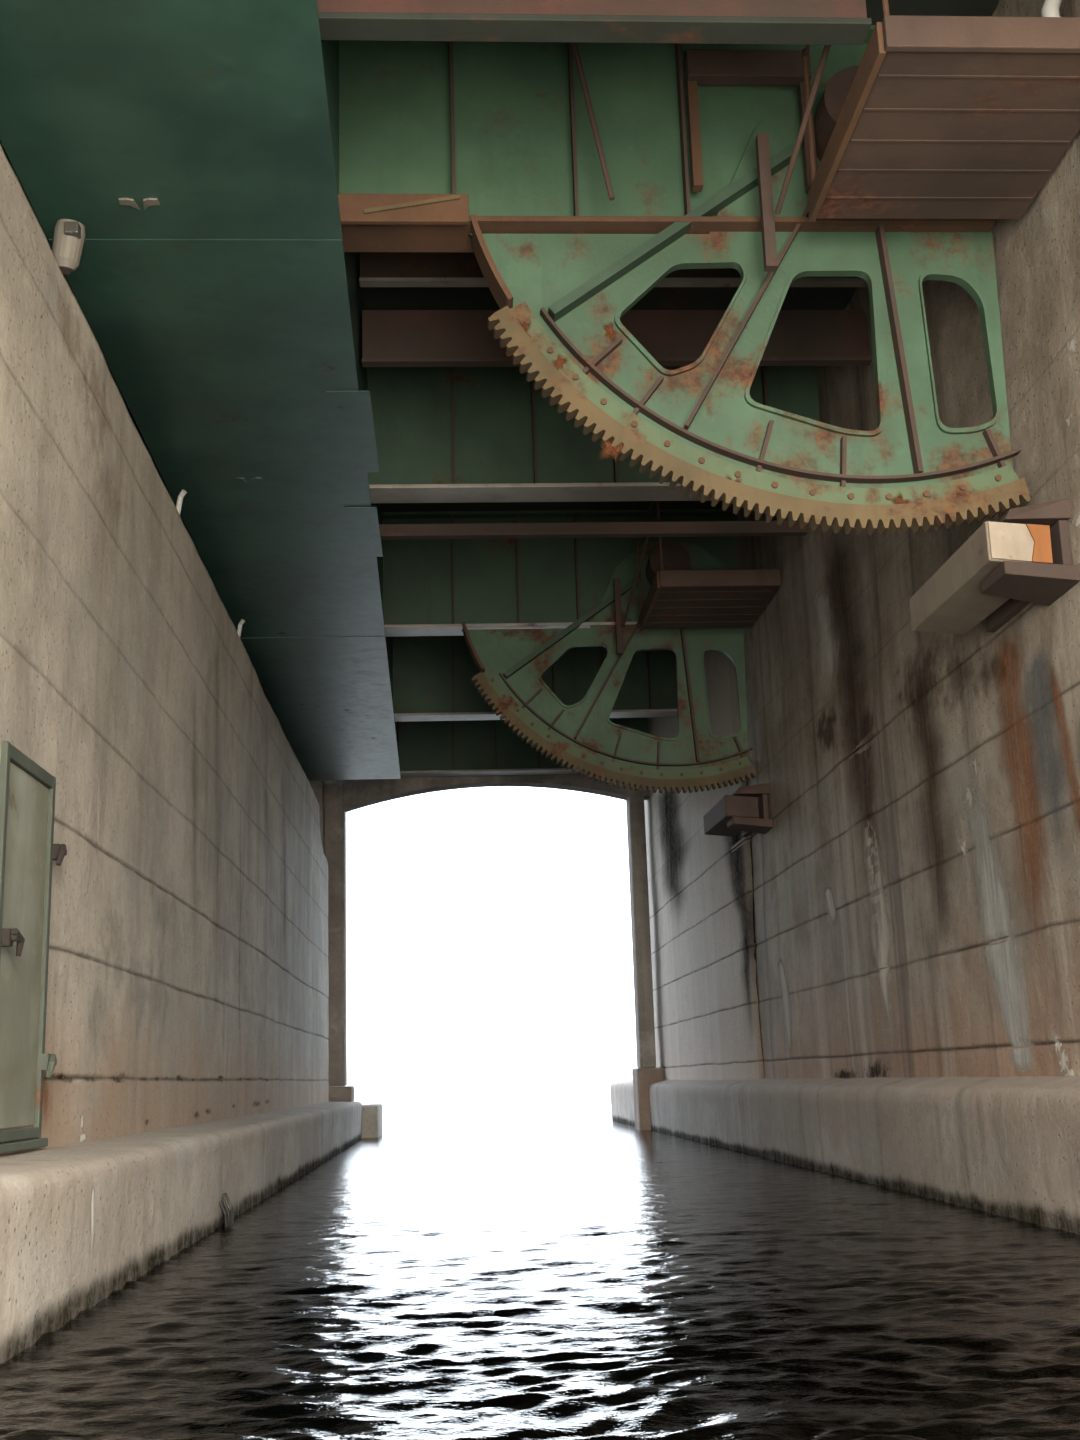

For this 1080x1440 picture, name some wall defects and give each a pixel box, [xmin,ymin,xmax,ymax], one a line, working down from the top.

water stain [660,789,684,898]
water stain [729,831,753,1001]
water stain [817,546,890,1014]
corrosion [1051,678,1080,823]